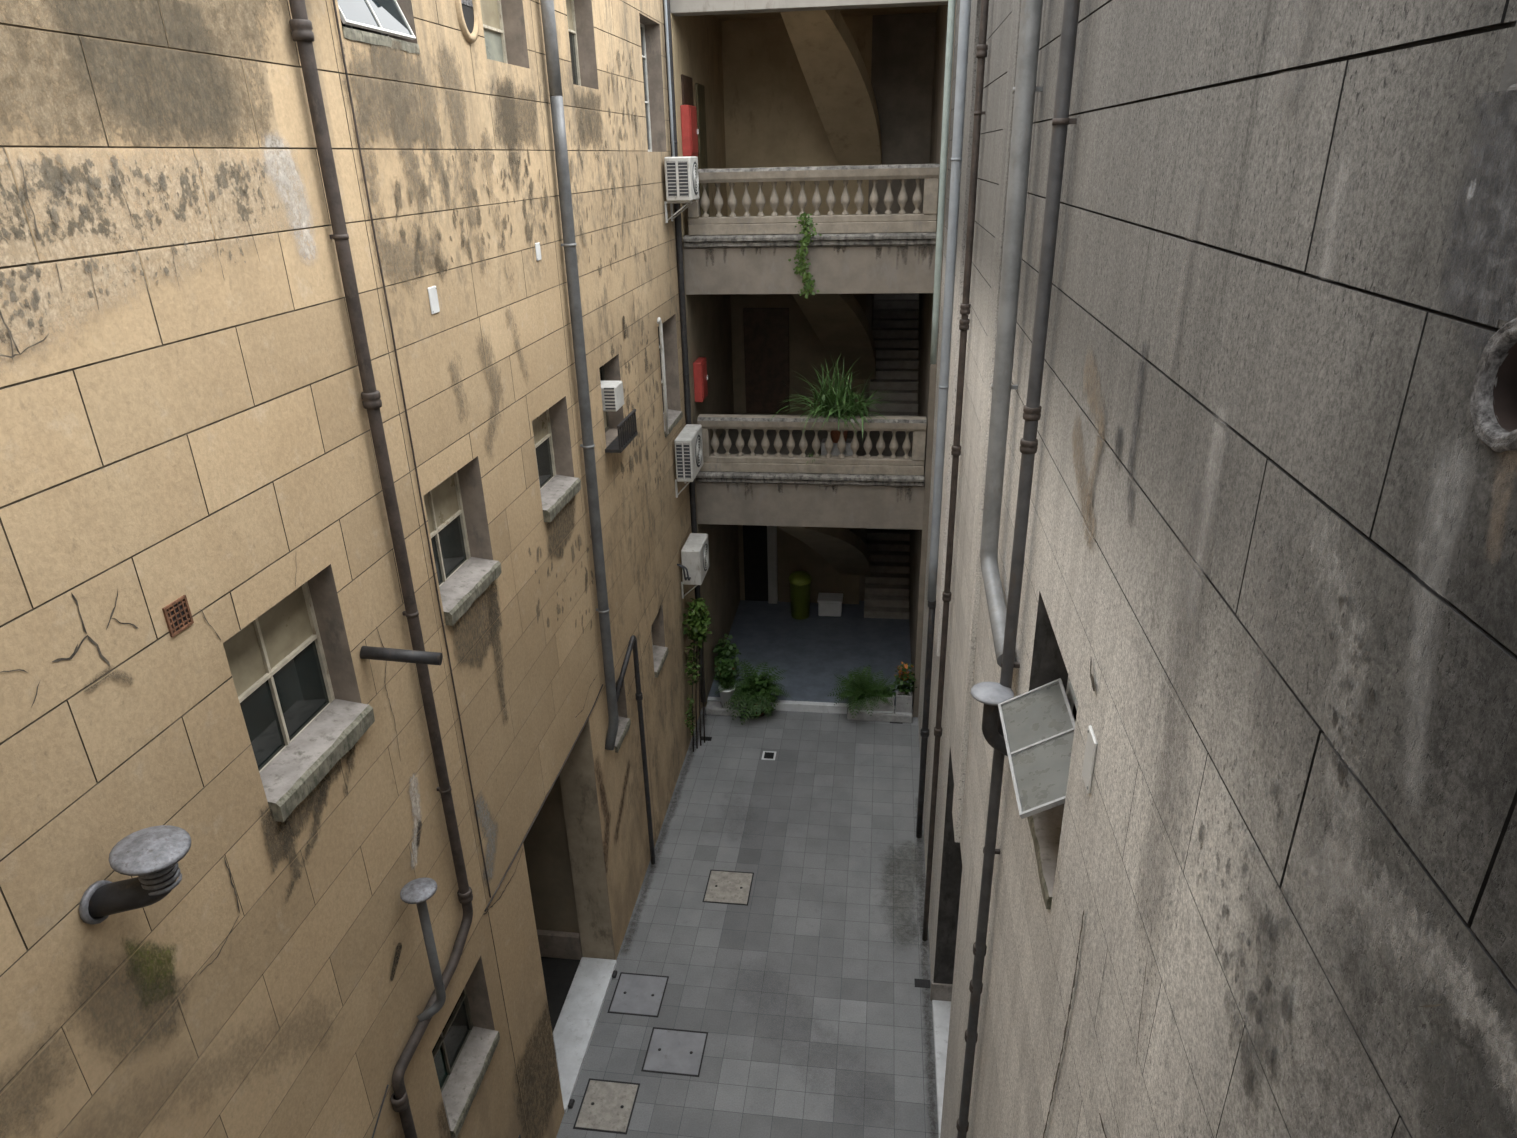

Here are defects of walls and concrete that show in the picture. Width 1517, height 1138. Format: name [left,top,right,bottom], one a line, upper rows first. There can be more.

water stain [59,0,231,137]
water stain [344,40,553,291]
crack [0,311,49,363]
crack [2,591,138,707]
water stain [452,581,507,720]
water stain [261,745,357,898]